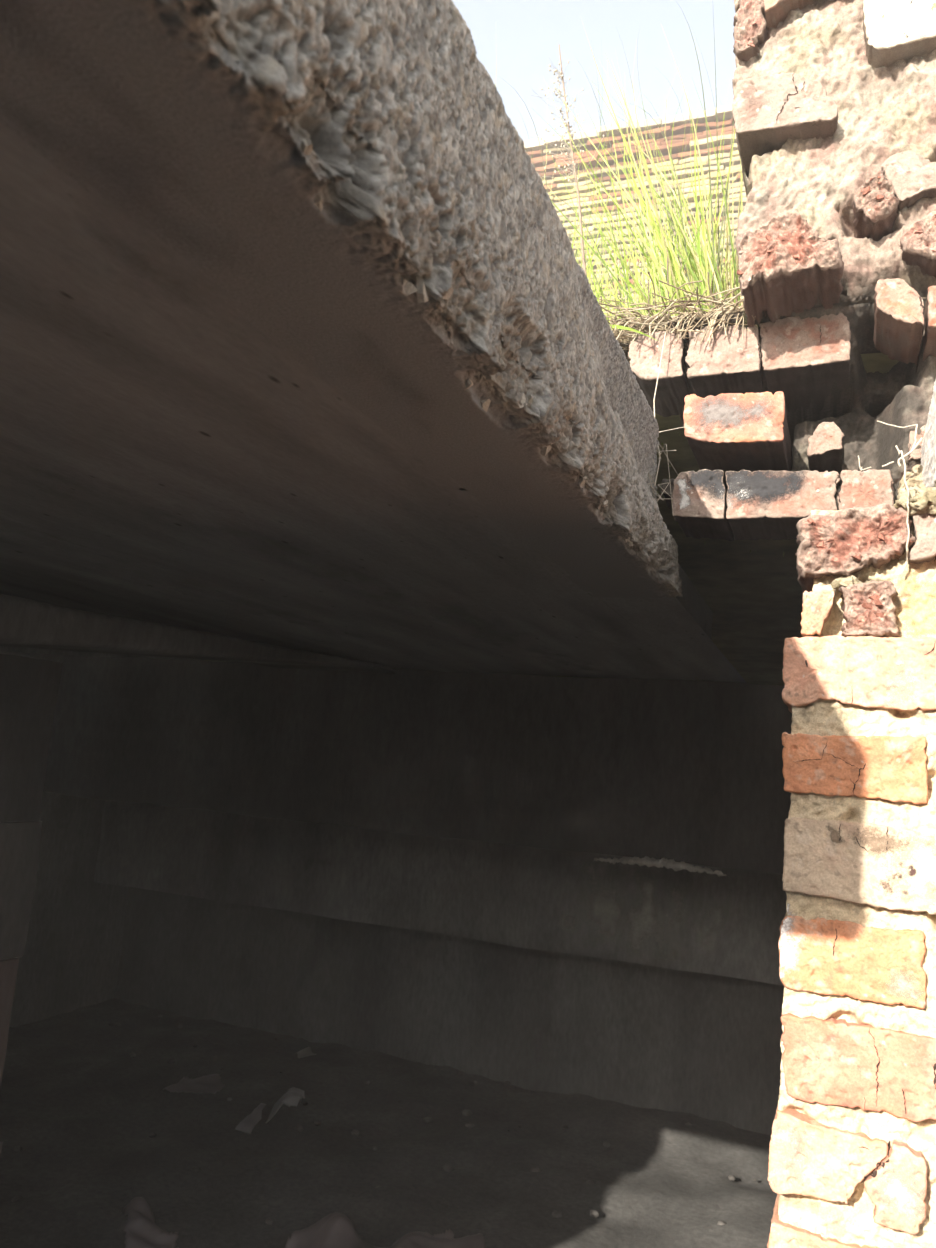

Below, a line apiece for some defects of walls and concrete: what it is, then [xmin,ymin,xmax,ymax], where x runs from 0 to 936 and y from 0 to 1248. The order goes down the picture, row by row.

crack [776,77,805,121]
spalling [0,0,683,598]
crack [797,743,866,795]
spalling [594,856,727,877]
crack [864,1029,906,1114]
crack [859,1140,891,1179]